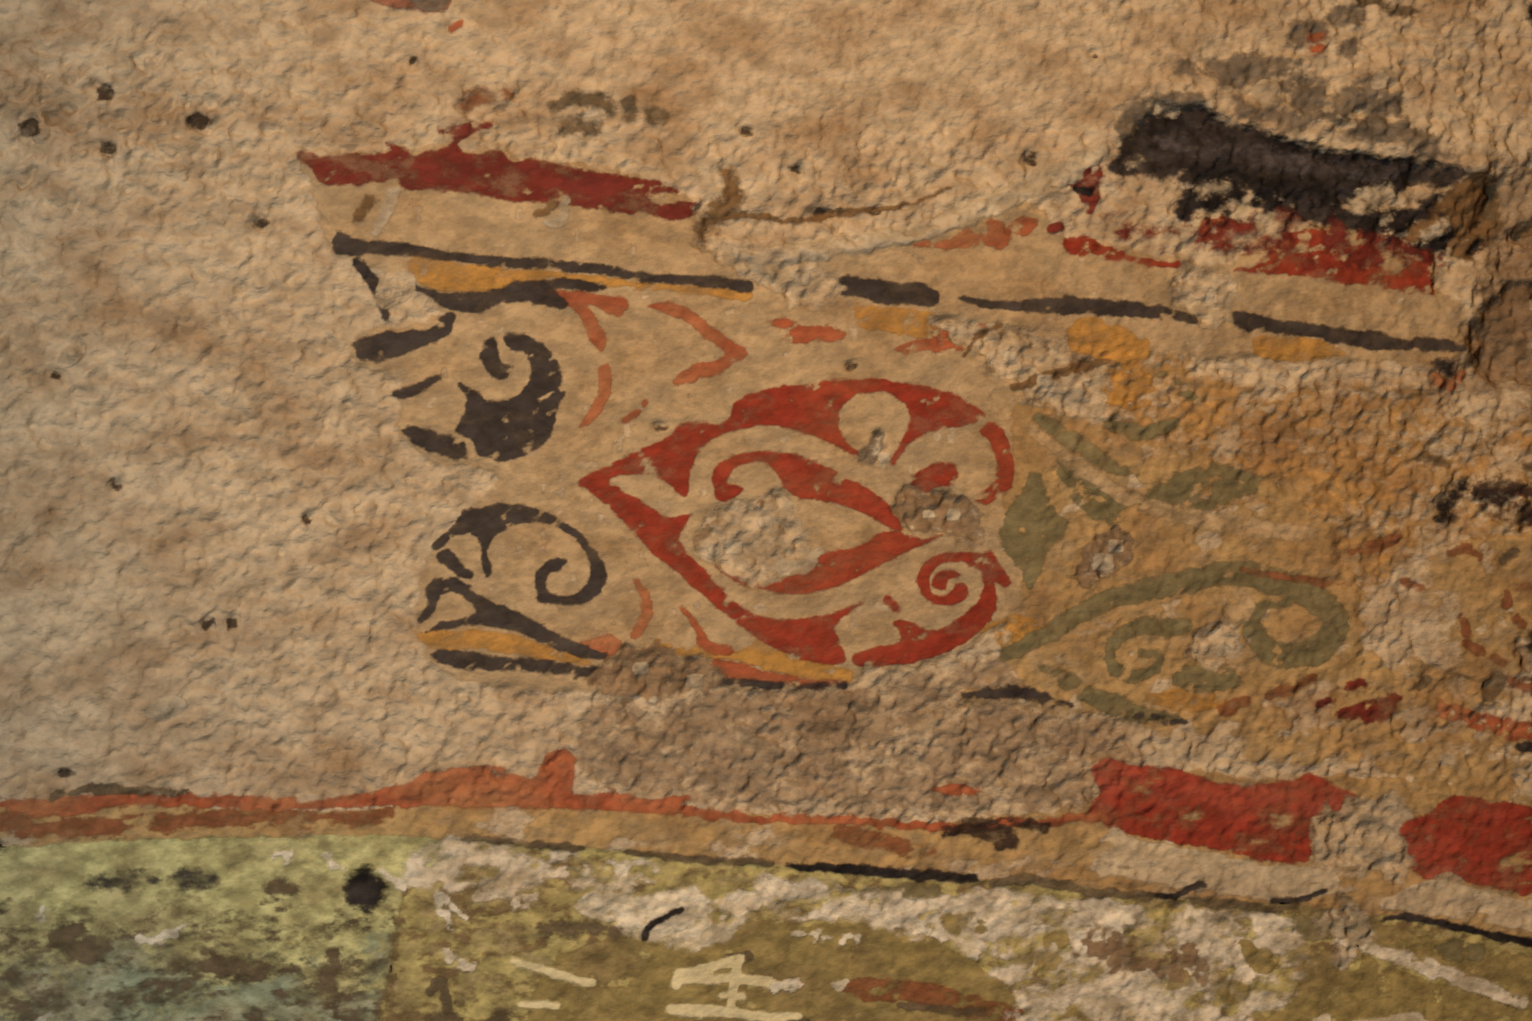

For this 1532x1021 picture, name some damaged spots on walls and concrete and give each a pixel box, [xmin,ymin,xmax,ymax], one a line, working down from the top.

peeling [1146,100,1178,119]
peeling [1195,181,1230,197]
peeling [1349,182,1395,225]
peeling [1419,218,1449,240]
flaking render [692,487,824,589]
peeling [378,835,1529,1021]